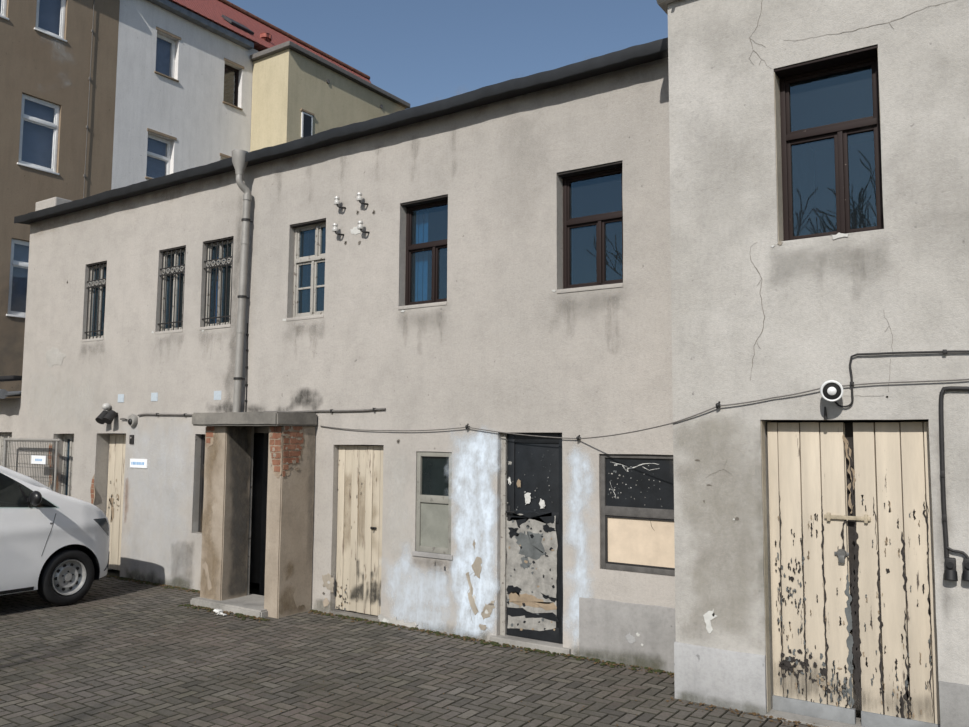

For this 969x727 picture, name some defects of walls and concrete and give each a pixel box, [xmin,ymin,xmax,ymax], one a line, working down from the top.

flaking render [269,426,304,478]
spalling [378,614,418,628]
peeling [703,609,717,635]